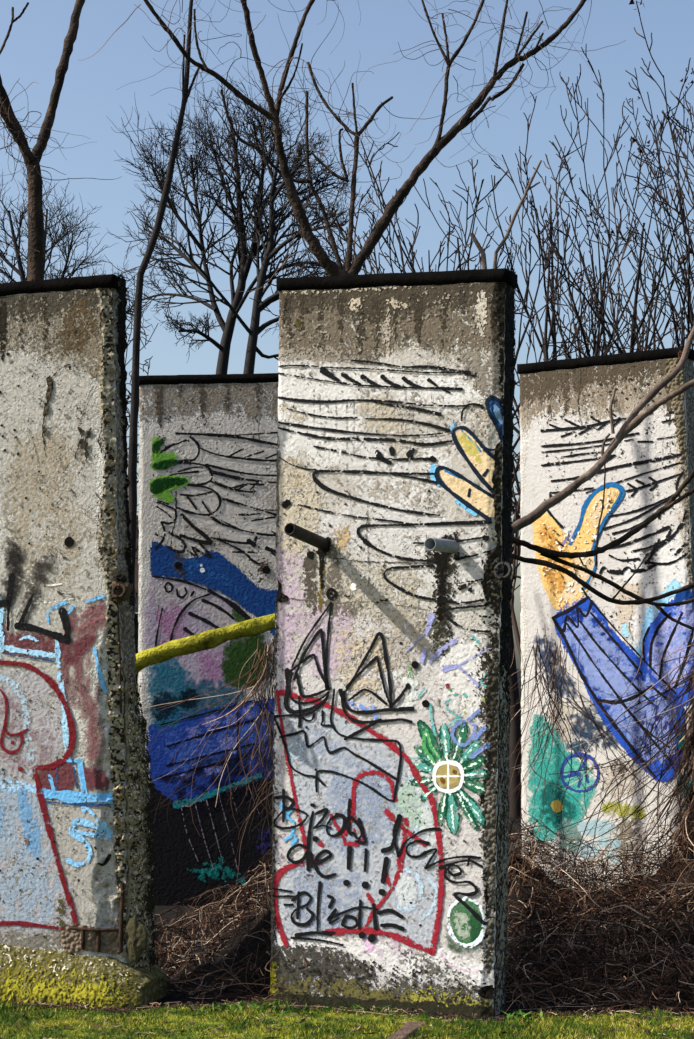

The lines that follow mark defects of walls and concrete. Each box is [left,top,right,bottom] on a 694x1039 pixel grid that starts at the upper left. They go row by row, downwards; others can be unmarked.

spalling [0,288,154,967]
peeling [150,283,504,1010]
damp [0,247,673,1016]
spalling [540,358,692,803]